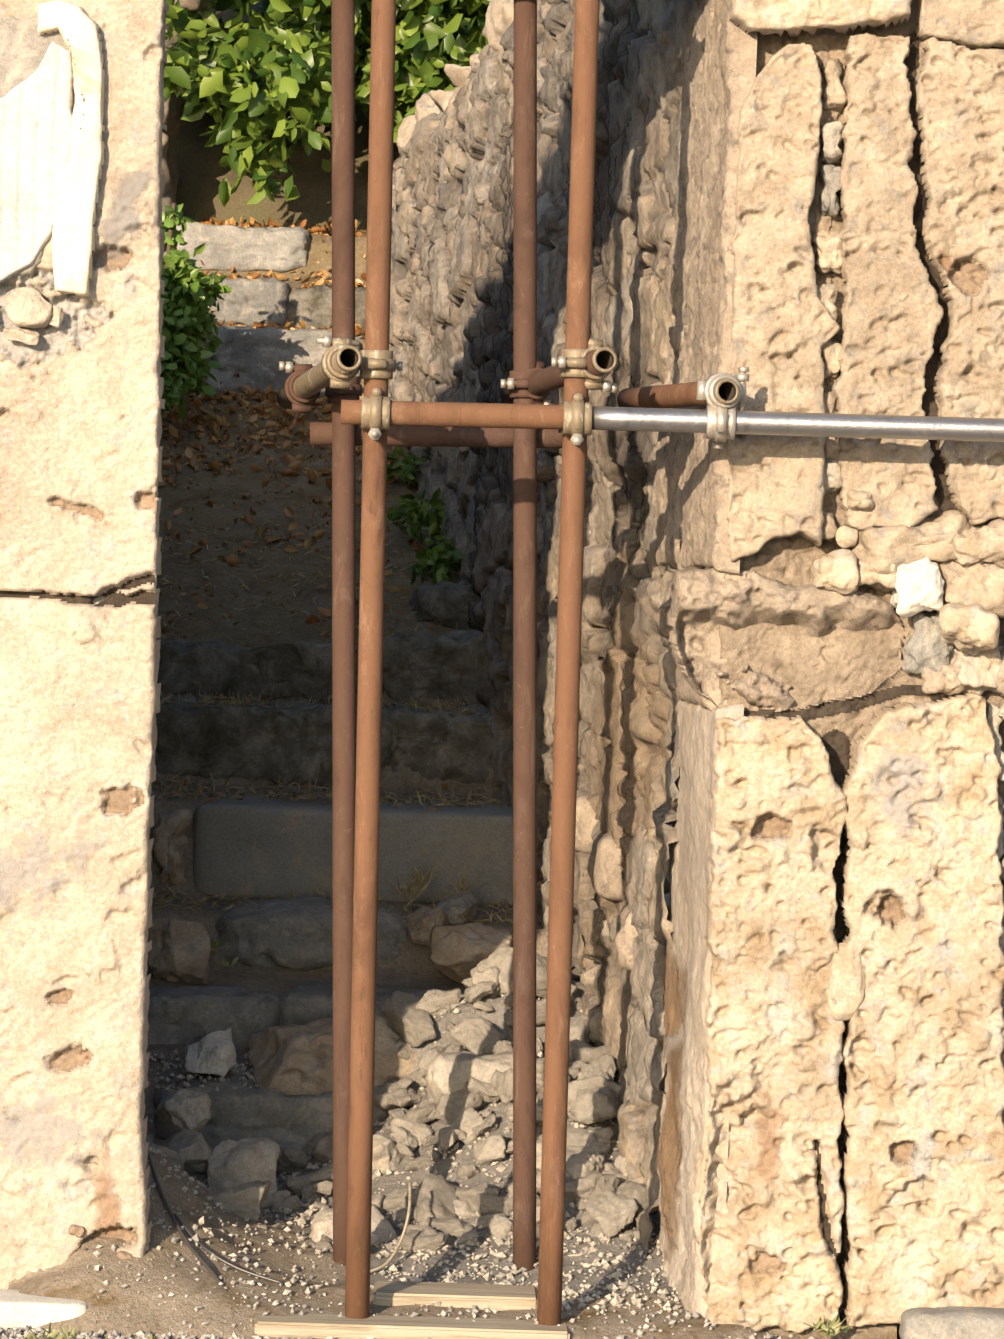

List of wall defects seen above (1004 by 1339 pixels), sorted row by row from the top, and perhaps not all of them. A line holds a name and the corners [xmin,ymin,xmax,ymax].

peeling [0,0,133,368]
crack [906,31,957,512]
crack [0,574,156,607]
crack [744,684,962,788]
crack [833,824,848,944]
crack [815,1032,846,1294]